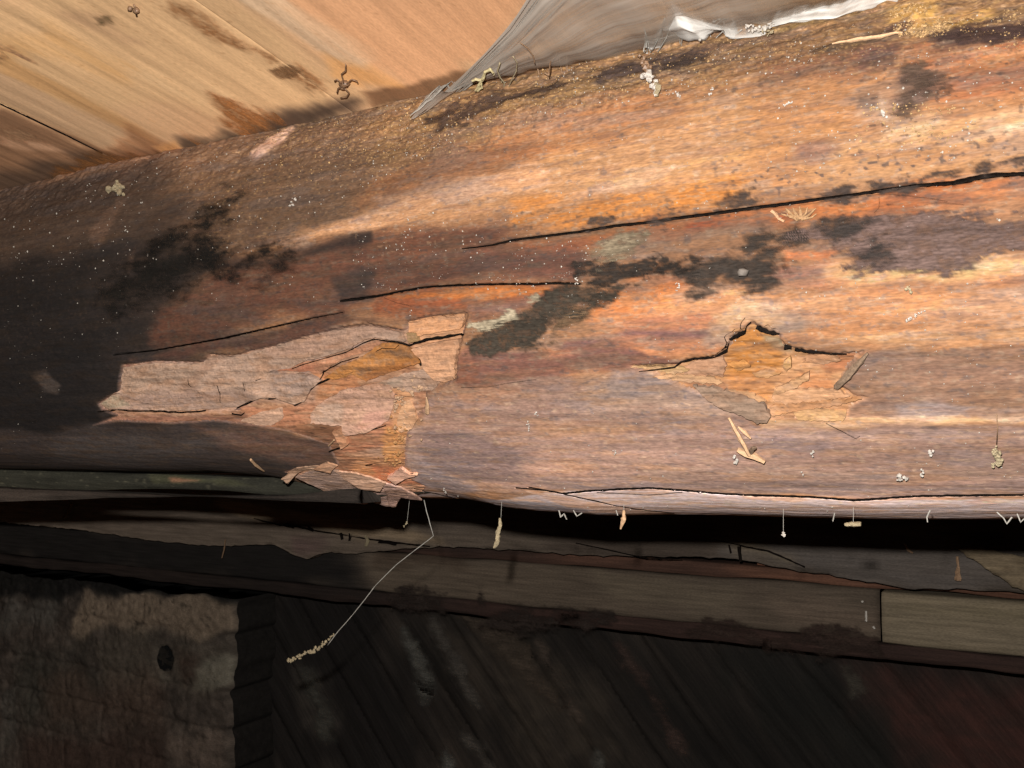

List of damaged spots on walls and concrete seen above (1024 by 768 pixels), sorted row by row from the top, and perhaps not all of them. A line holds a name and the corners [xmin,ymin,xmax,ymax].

leakage [975,162,991,173]
crack [462,172,1024,249]
leakage [101,196,295,317]
leakage [466,181,1024,358]
crack [98,333,464,416]
peeling [101,313,468,449]
crack [115,282,580,355]
crack [639,318,847,372]
peeling [631,353,862,424]
peeling [387,466,418,485]
crack [516,487,1024,514]